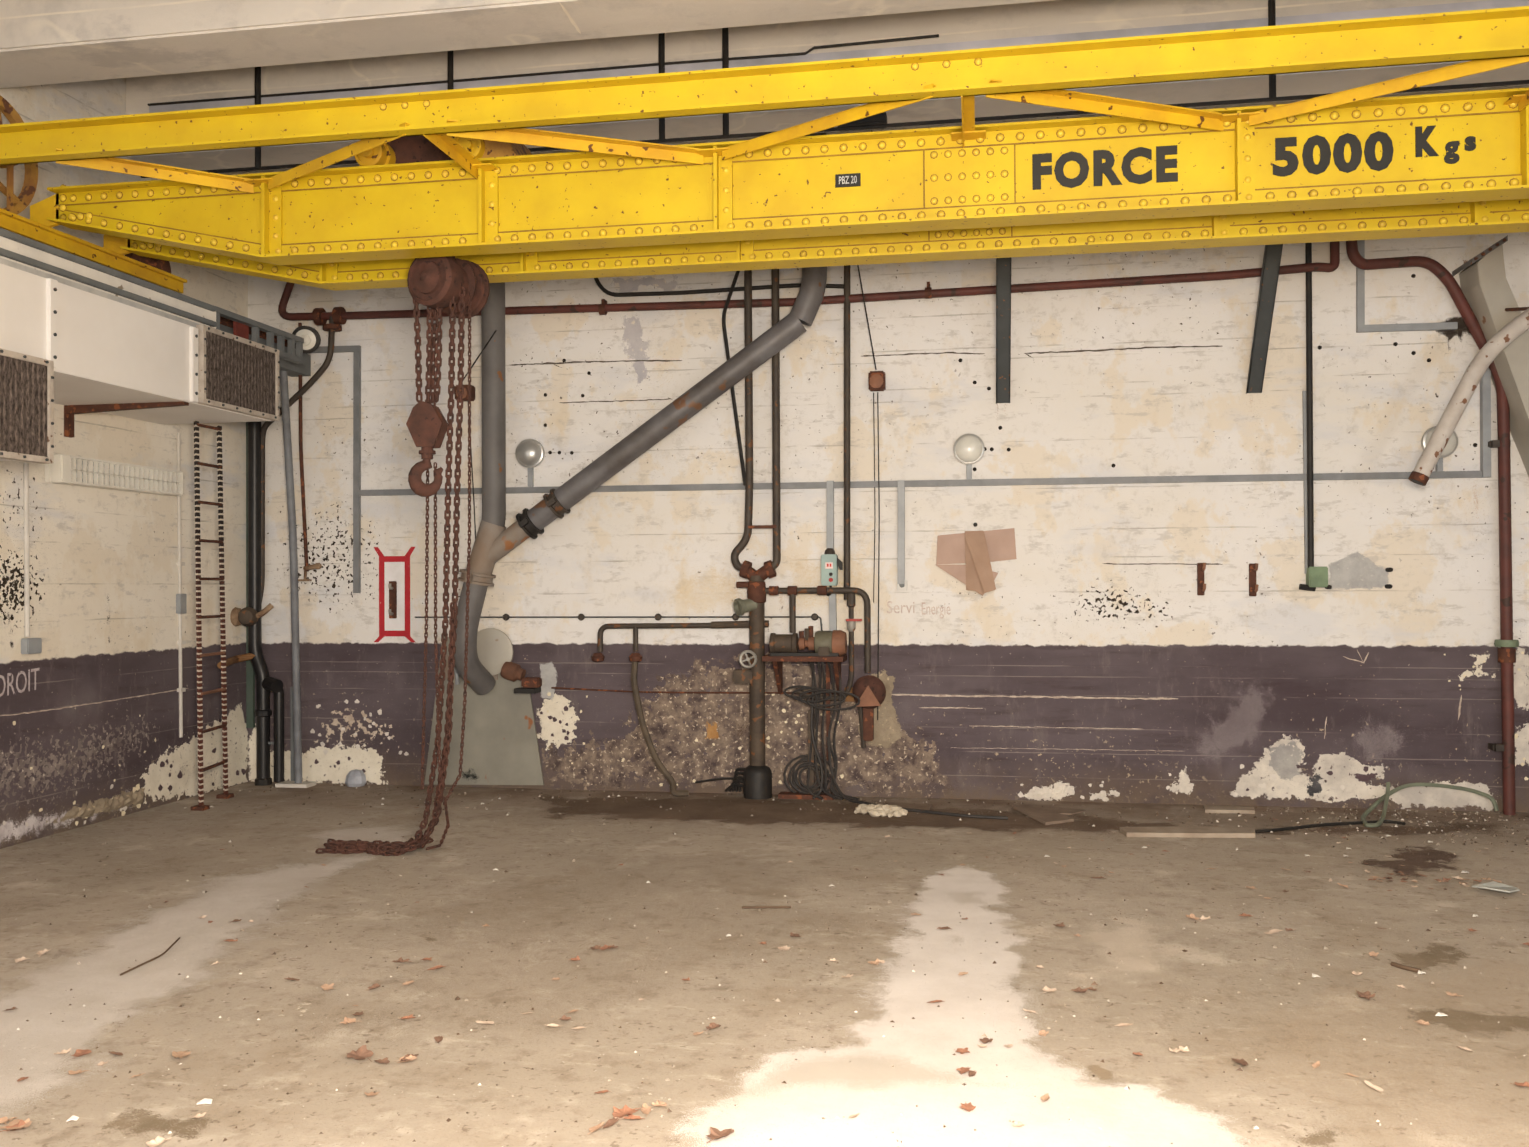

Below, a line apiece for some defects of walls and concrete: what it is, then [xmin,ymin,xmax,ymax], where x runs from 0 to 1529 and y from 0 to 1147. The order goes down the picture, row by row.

damp [0,470,46,647]
damp [280,494,380,613]
damp [1069,580,1168,629]
damp [0,784,132,844]
peeling [0,699,409,826]
peeling [536,652,949,797]
peeling [1166,766,1194,795]
peeling [1230,734,1497,811]
peeling [1448,651,1496,690]
peeling [1513,647,1529,780]
damp [0,822,423,1126]
damp [668,864,1529,1147]